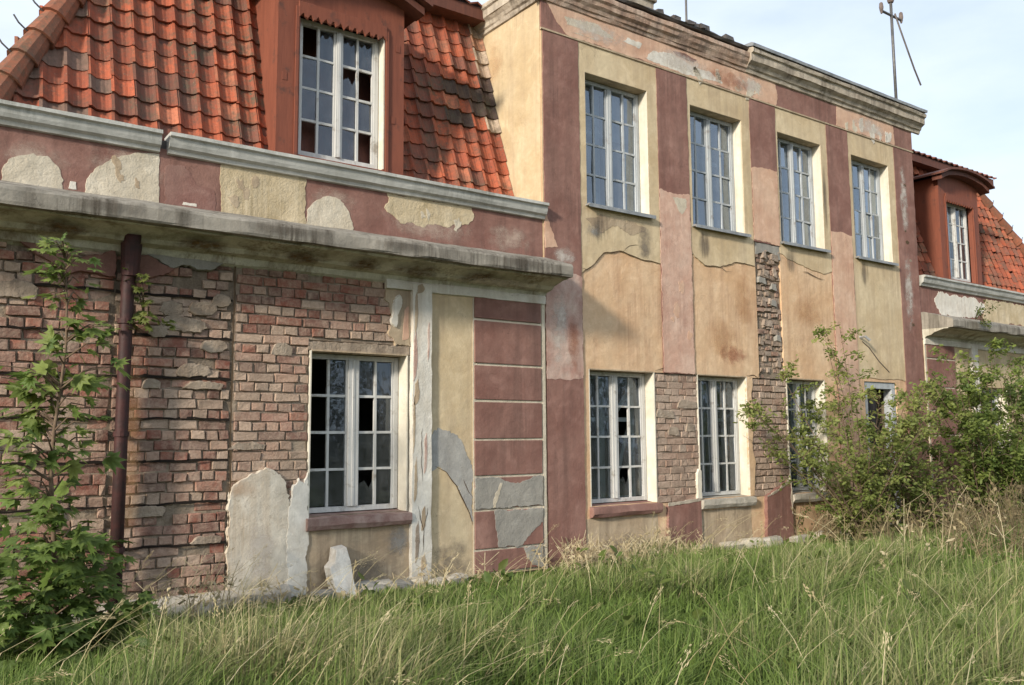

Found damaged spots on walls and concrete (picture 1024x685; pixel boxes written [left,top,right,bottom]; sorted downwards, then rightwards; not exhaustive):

peeling [546,2,778,105]
flaking render [2,153,354,230]
flaking render [384,193,474,232]
crack [582,245,658,273]
peeling [934,291,1024,326]
flaking render [122,266,430,598]
flaking render [474,475,544,567]